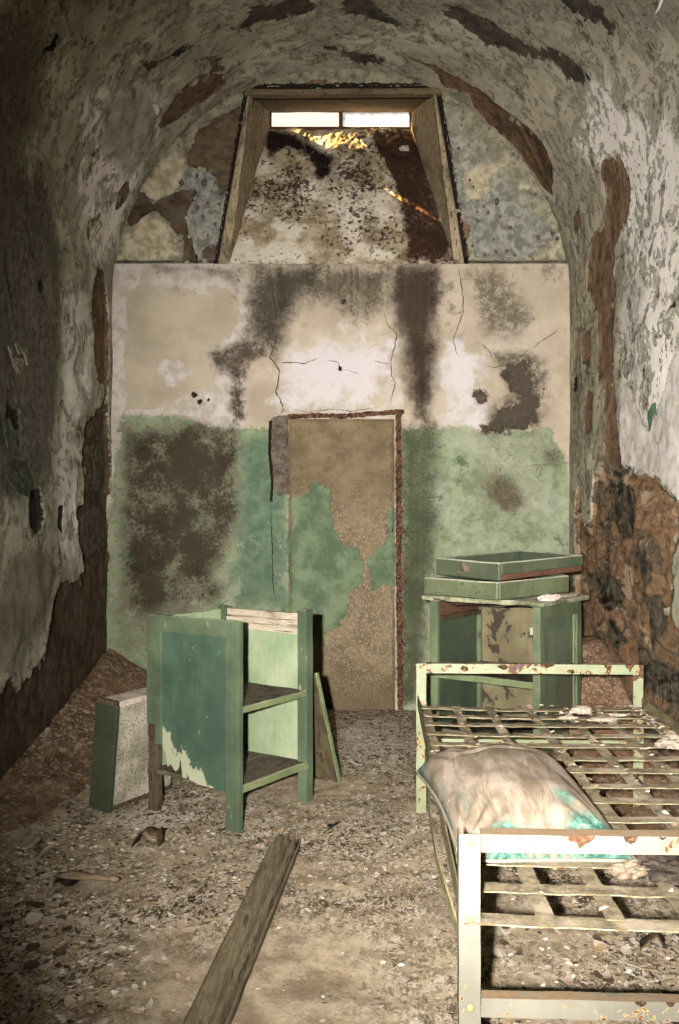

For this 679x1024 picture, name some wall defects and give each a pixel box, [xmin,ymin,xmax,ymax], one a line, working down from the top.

flaking render [115,106,244,264]
flaking render [153,57,230,129]
flaking render [409,57,553,195]
flaking render [0,264,112,781]
mould [123,426,236,611]
damp [210,266,438,704]
crack [269,285,397,421]
peeling [283,481,397,648]
crack [453,266,464,355]
damp [491,354,545,429]
flaking render [573,155,679,723]
flaking render [643,721,679,769]